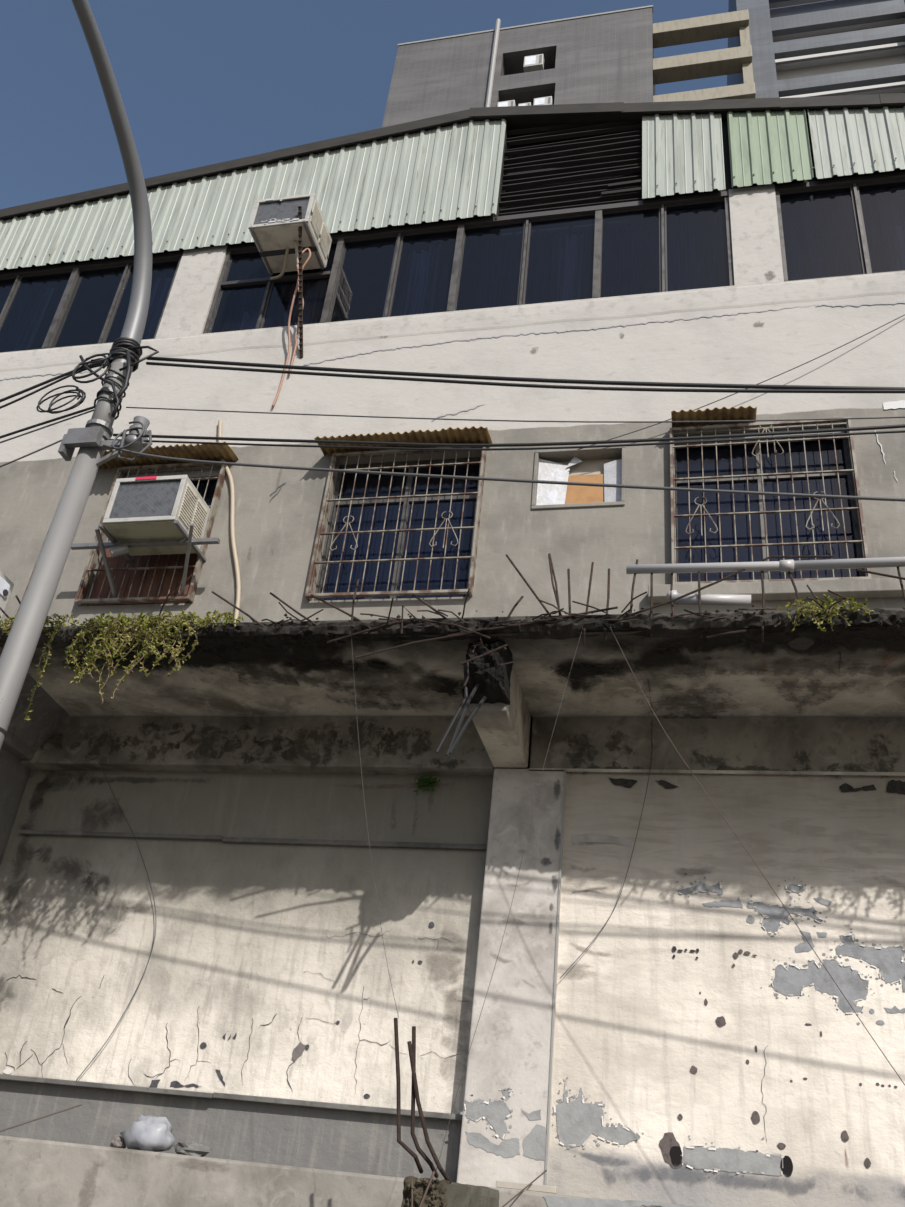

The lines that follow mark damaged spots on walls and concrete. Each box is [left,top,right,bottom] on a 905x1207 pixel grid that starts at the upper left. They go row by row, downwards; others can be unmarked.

water stain [40,630,464,769]
water stain [557,622,905,719]
spalling [839,780,905,794]
peeling [676,873,905,1025]
crack [5,975,104,1077]
crack [128,1007,210,1086]
crack [241,989,462,1092]
spalling [394,1018,452,1184]
peeling [457,1077,644,1161]
water stain [583,1153,621,1181]
peeling [659,1114,786,1178]
water stain [637,1165,813,1193]